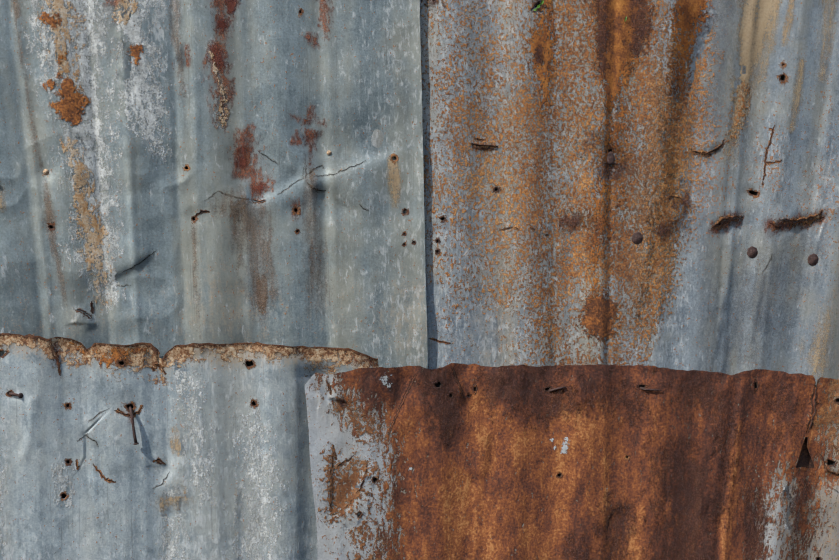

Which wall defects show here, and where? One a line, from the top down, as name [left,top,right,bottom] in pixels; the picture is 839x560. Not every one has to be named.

rust [305,0,334,46]
rust [202,0,237,128]
rust [222,124,274,310]
rust [710,212,743,233]
rust [764,209,827,235]
rust [318,441,375,524]
rust [346,520,370,560]
rust [777,491,792,540]